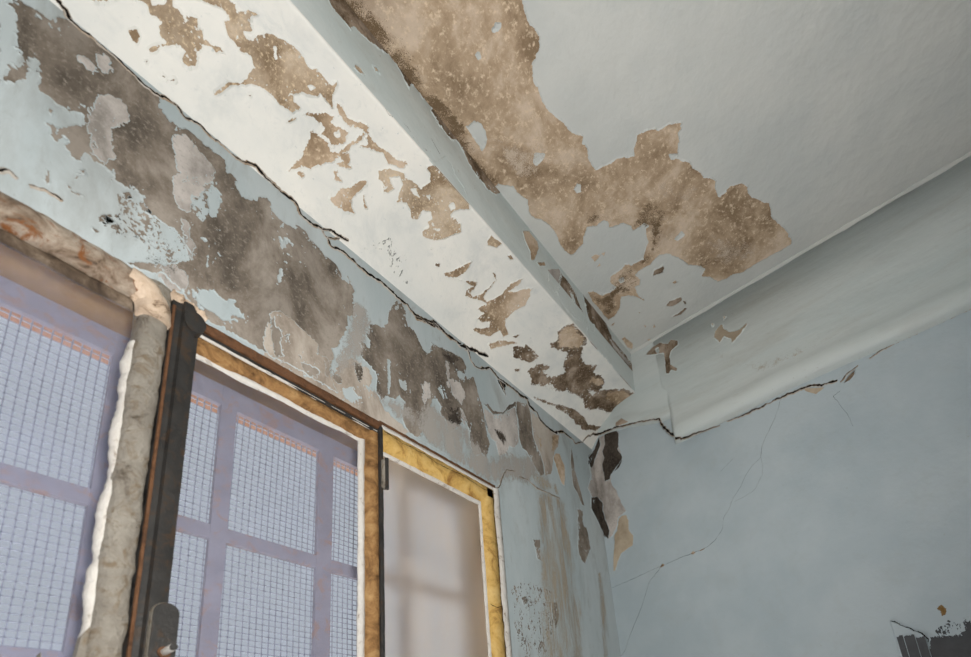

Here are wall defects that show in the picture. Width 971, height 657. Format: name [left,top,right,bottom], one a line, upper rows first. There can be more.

crack [0,167,63,202]
peeling [0,0,634,657]
crack [384,431,560,657]
crack [55,0,917,474]
peeling [328,0,792,432]